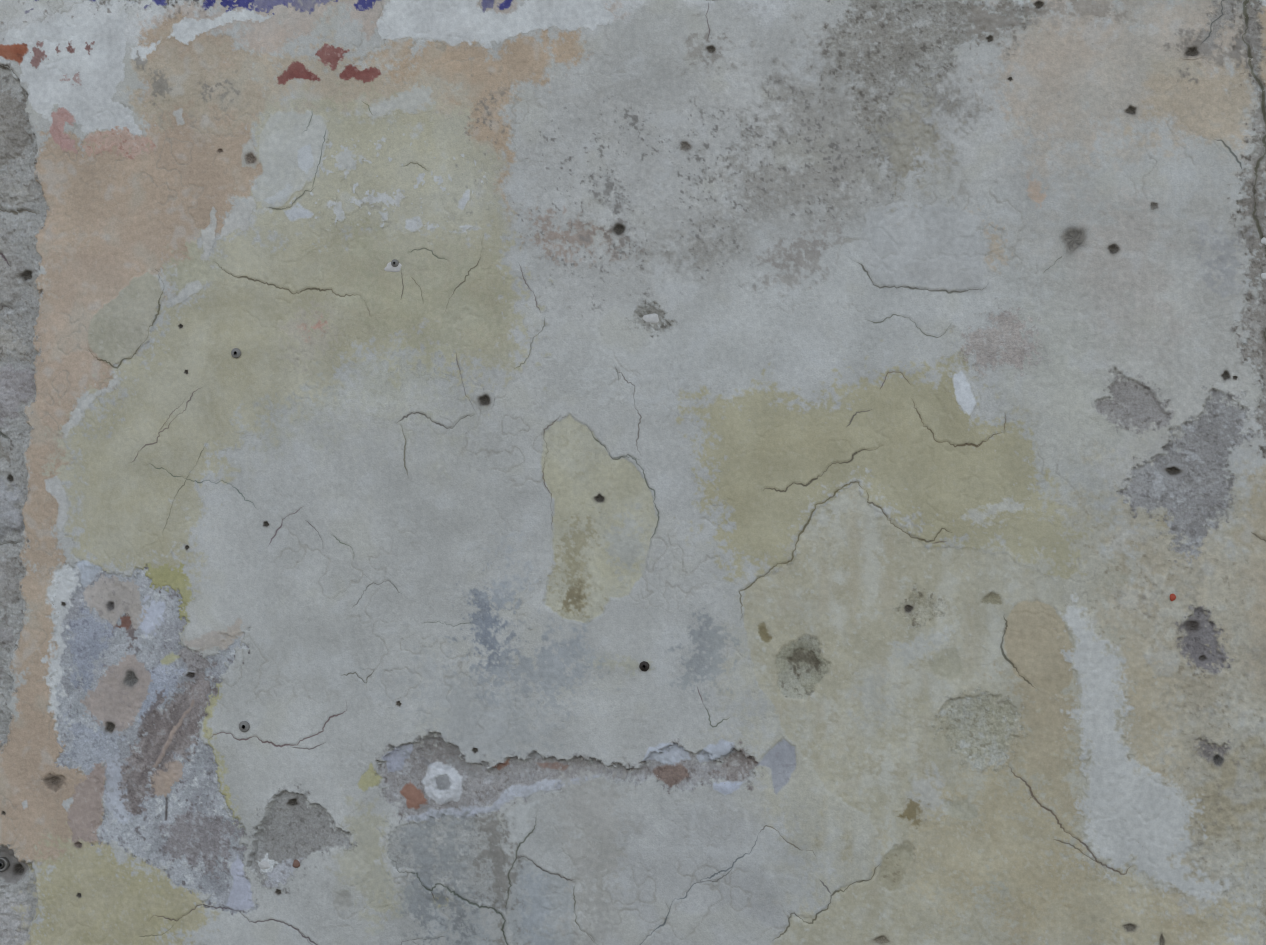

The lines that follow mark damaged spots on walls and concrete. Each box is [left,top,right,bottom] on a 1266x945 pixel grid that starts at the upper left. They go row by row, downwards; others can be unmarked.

flaking render [807,0,1043,187]
crack [213,261,370,315]
crack [1199,0,1266,479]
crack [130,388,402,608]
peeling [0,63,554,945]
peeling [540,414,660,623]
peeling [594,650,656,681]
crack [738,371,1006,620]
peeling [672,291,1266,945]
crack [389,815,596,945]
crack [639,825,881,945]
crack [1008,766,1131,875]